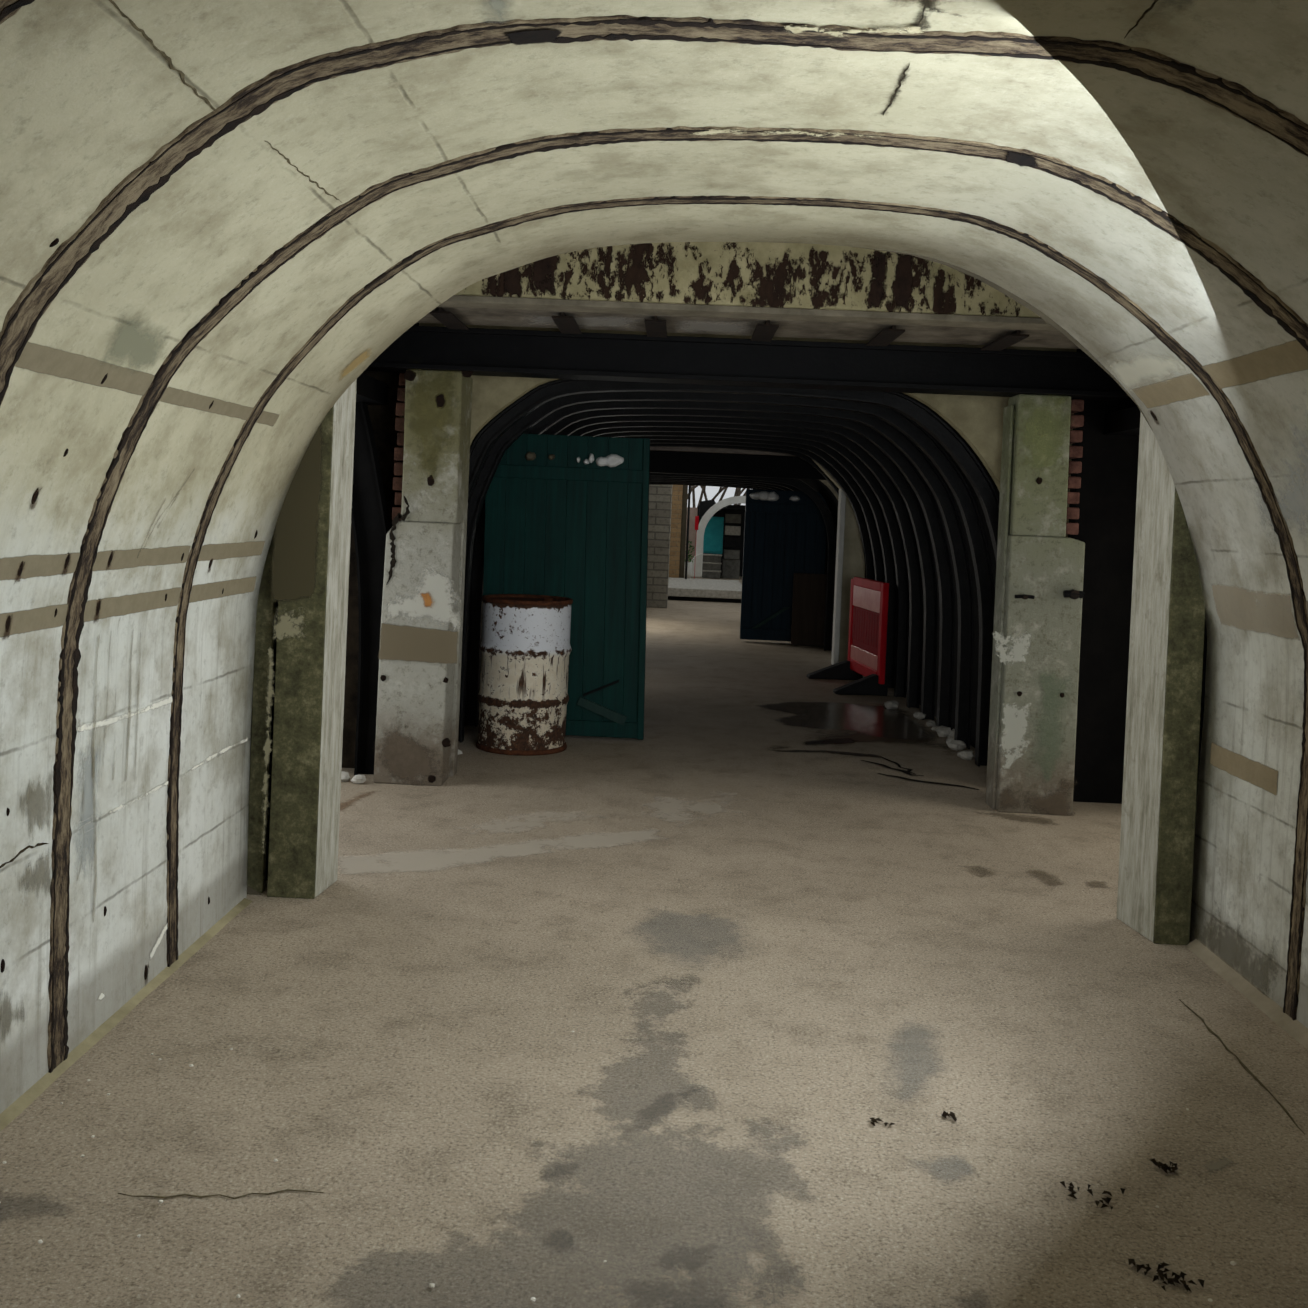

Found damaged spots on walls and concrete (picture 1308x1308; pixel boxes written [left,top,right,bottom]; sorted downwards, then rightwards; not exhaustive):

crack [914,0,960,30]
crack [1124,0,1158,39]
crack [881,63,910,115]
flaking render [392,373,406,520]
peeling [387,569,460,629]
peeling [993,631,1031,664]
water stain [775,727,946,757]
peeling [1000,702,1031,775]
crack [1179,999,1305,1135]
crack [118,1189,324,1199]